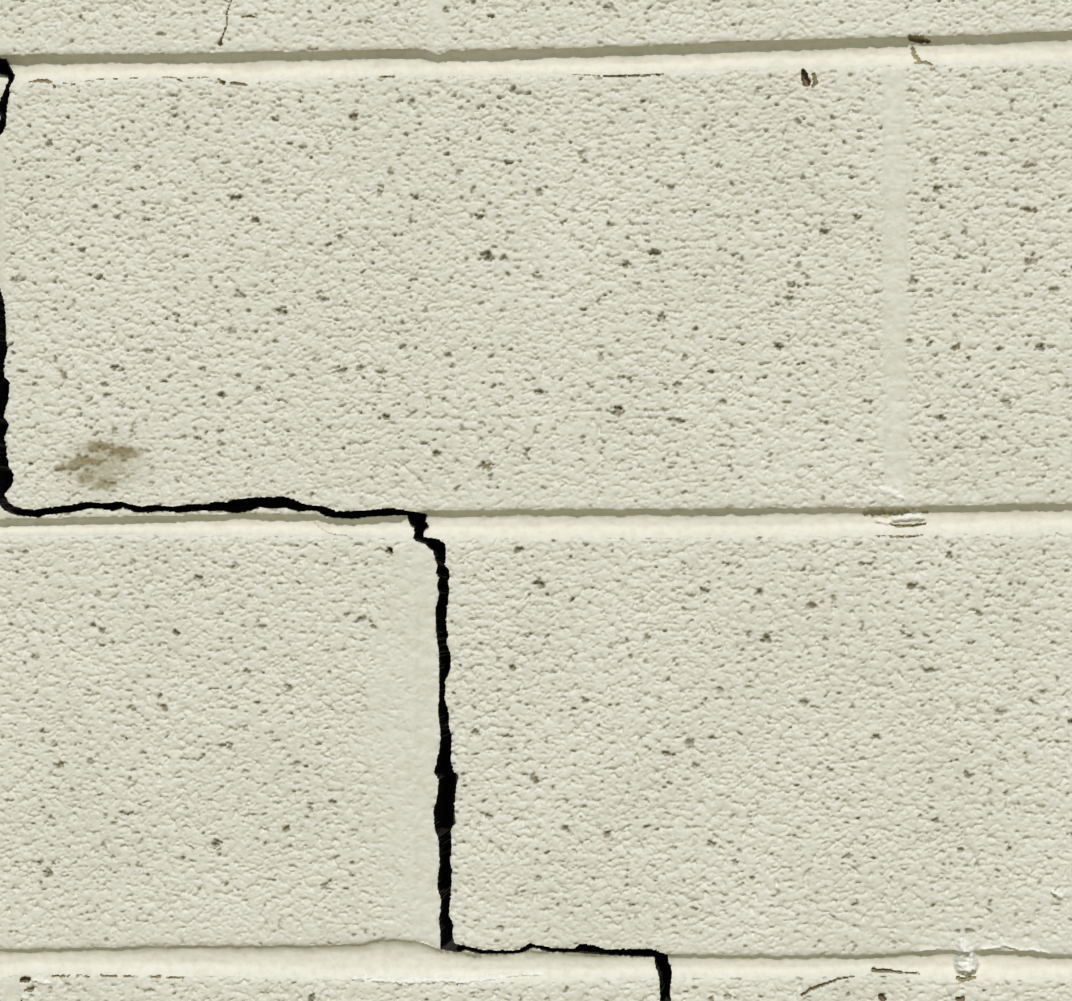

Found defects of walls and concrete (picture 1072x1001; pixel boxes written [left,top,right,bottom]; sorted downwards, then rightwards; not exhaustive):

crack [0,58,15,135]
crack [0,288,672,1001]